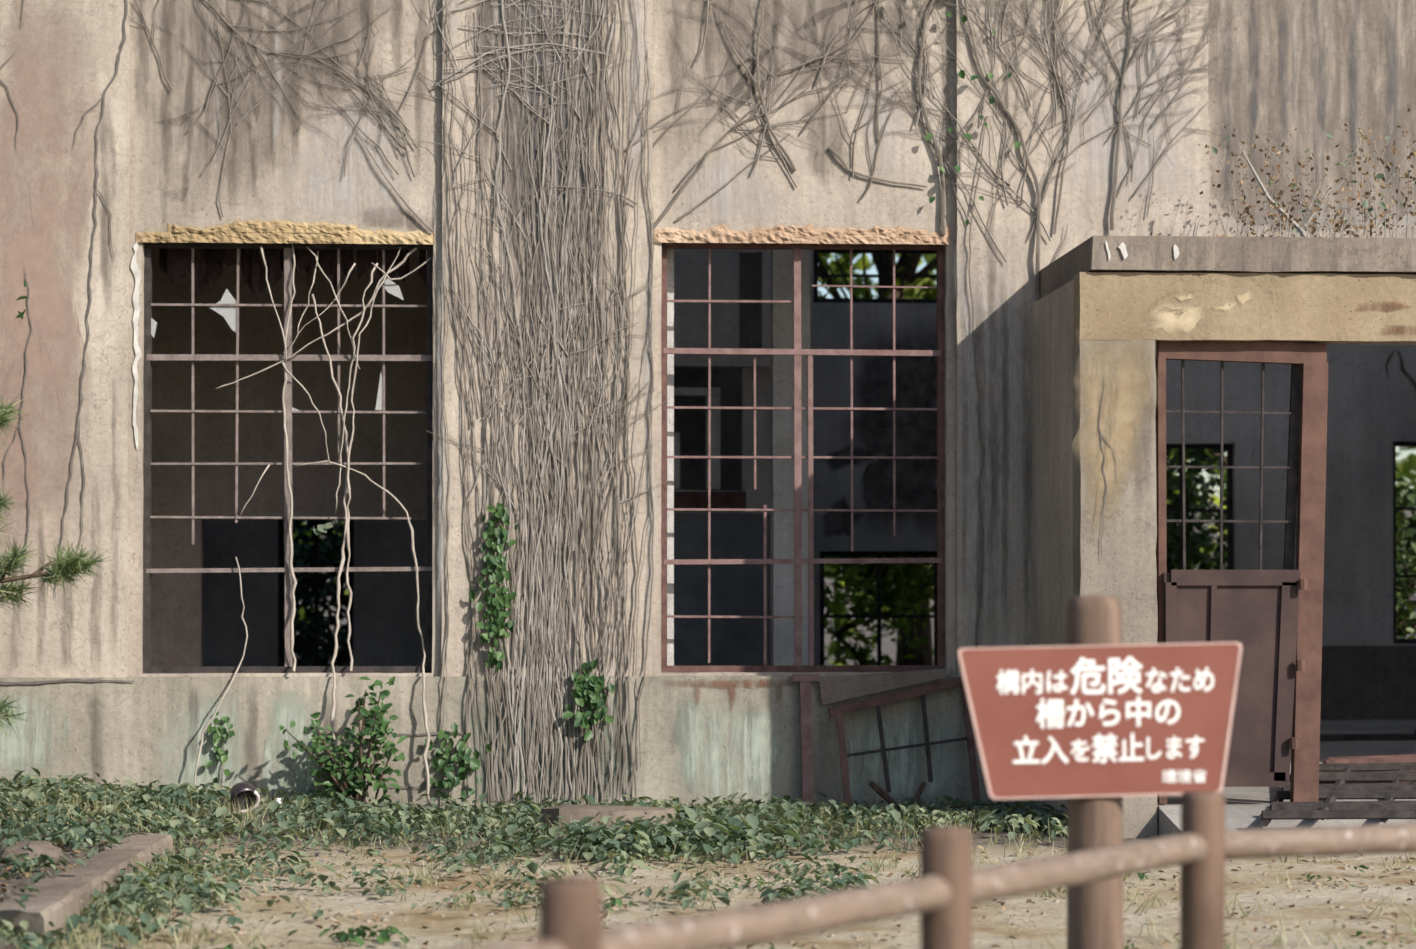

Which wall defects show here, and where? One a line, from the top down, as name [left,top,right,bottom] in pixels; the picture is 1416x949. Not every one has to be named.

damp [1221,0,1416,226]
peeling [1151,291,1252,334]
crack [1385,348,1416,391]